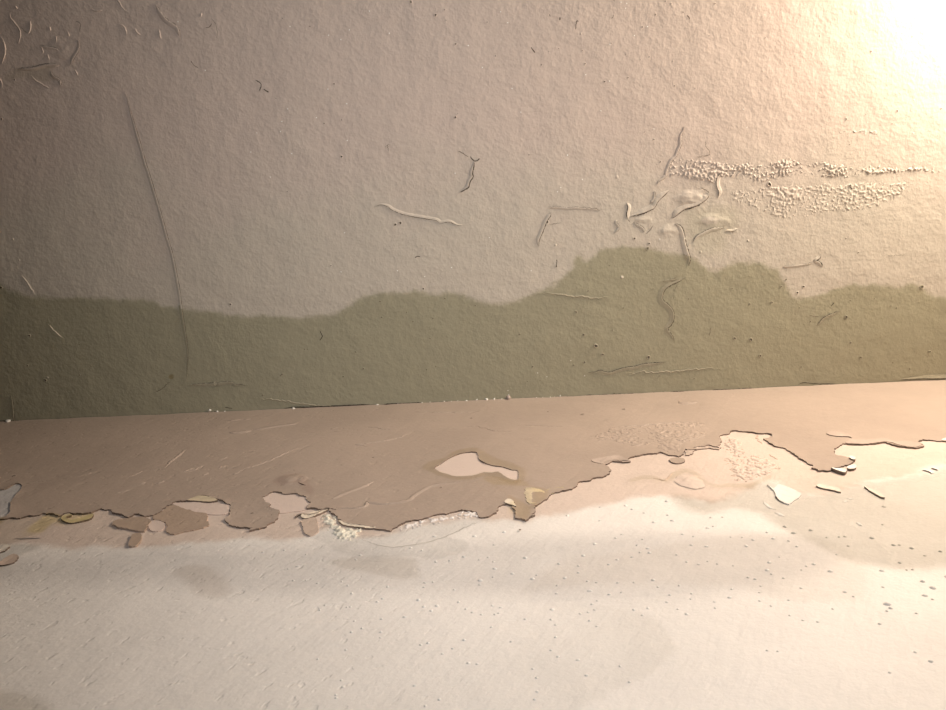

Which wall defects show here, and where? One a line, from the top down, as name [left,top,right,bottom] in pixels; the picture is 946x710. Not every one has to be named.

crack [459,151,479,192]
crack [376,203,461,226]
crack [125,92,188,376]
crack [536,127,737,341]
crack [214,402,420,434]
water stain [0,380,946,542]
peeling [435,453,519,480]
peeling [827,430,923,475]
peeling [173,495,230,515]
peeling [262,484,328,519]
peeling [767,484,802,505]
peeling [338,520,376,530]